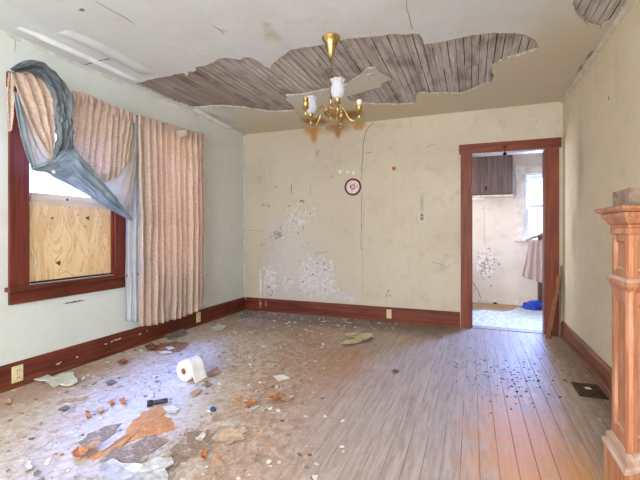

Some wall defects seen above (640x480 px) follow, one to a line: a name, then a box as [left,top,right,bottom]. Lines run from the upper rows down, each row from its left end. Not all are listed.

spalling [572,0,628,29]
spalling [136,32,538,112]
rust [302,110,367,143]
crack [360,122,374,292]
peeling [263,245,359,303]
peeling [476,248,500,287]